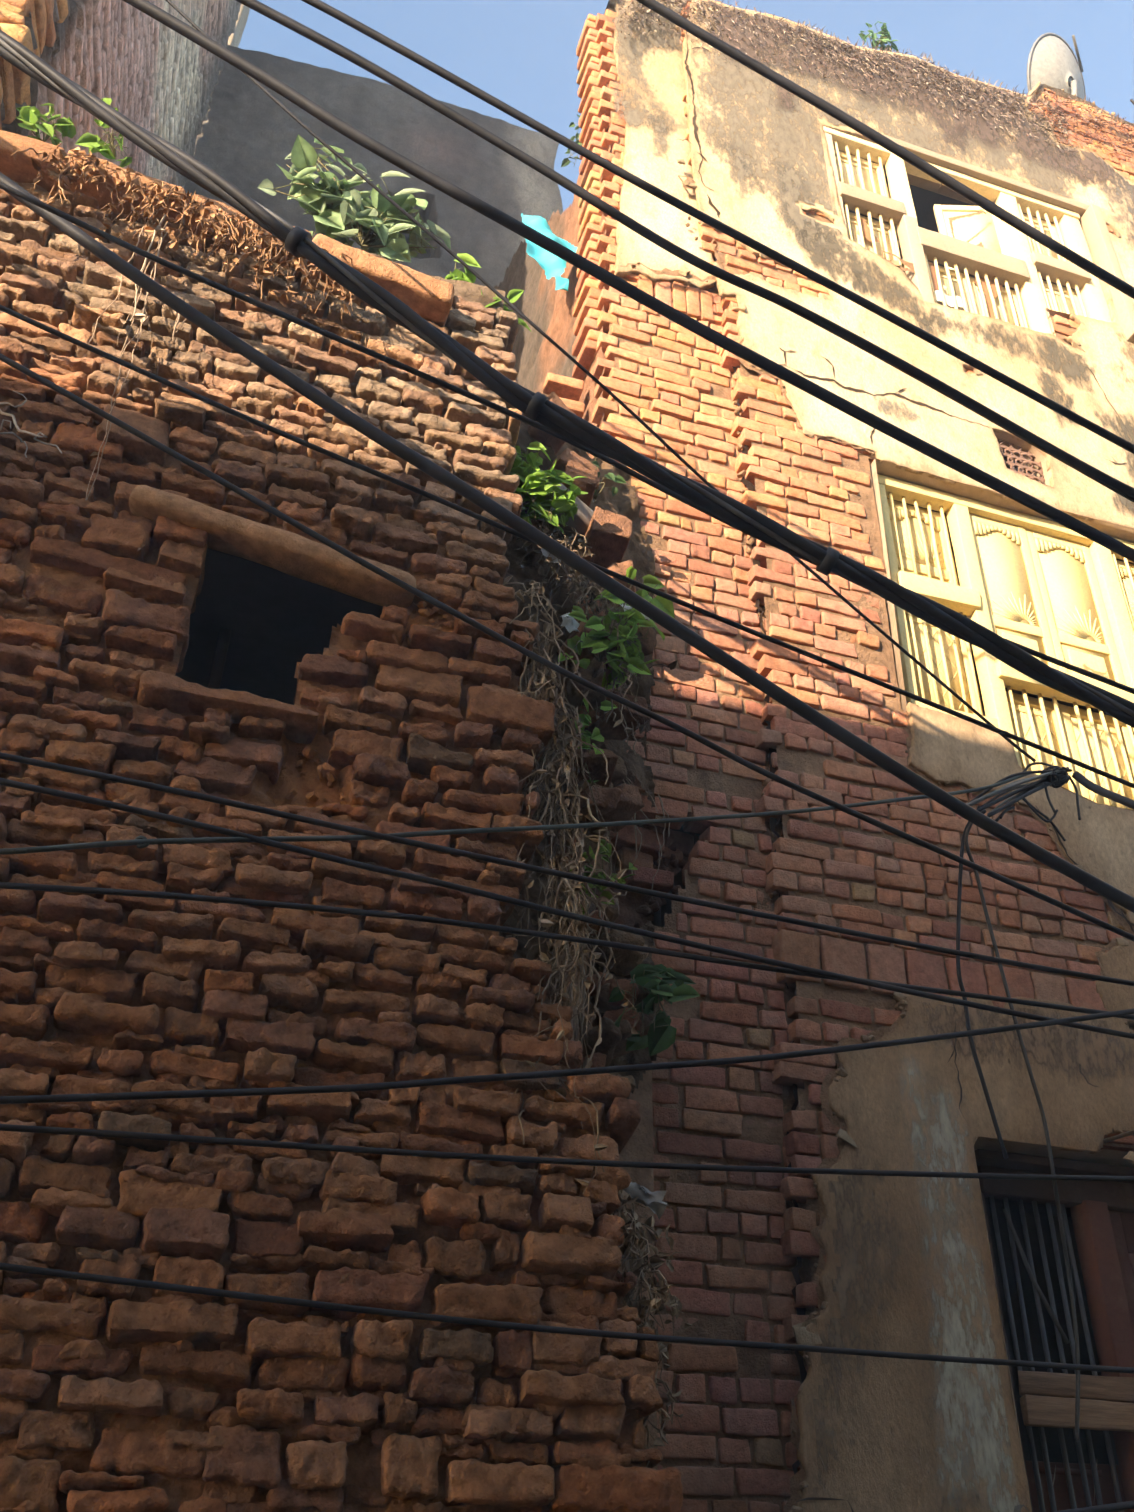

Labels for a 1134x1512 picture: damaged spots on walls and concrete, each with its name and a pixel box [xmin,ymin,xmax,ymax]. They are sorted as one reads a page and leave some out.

crack [677,31,720,218]
flaking render [1028,88,1134,183]
flaking render [620,216,833,300]
water stain [612,0,1134,422]
flaking render [855,216,948,291]
peeling [974,275,1003,318]
flaking render [736,337,875,455]
crack [779,347,988,442]
water stain [1095,412,1134,477]
crack [732,366,767,639]
water stain [1113,493,1134,514]
crack [761,678,780,852]